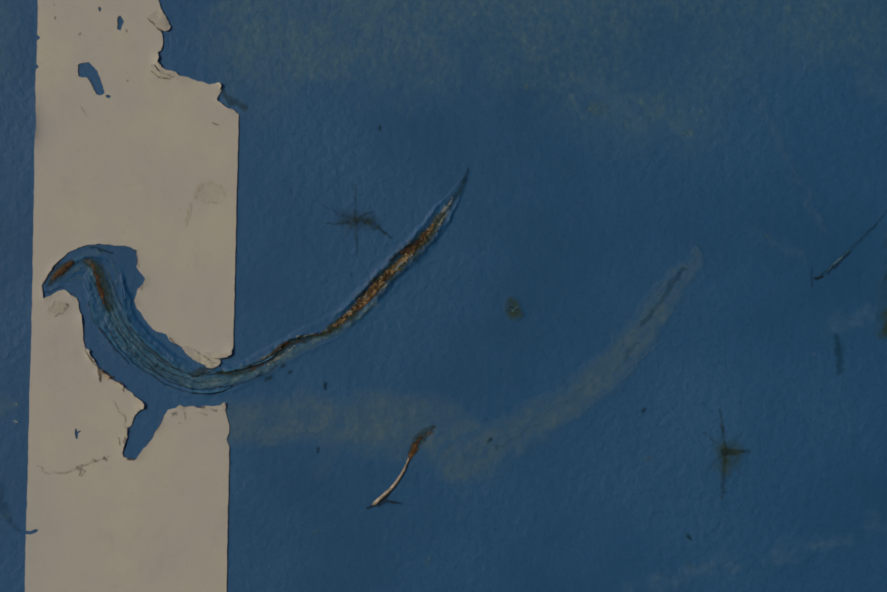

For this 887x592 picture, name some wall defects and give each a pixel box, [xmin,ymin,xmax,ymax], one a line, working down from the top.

peeling [78,62,111,98]
peeling [148,0,222,103]
corrosion [49,259,112,312]
spalling [42,169,468,461]
corrosion [217,213,445,374]
corrosion [407,426,435,460]